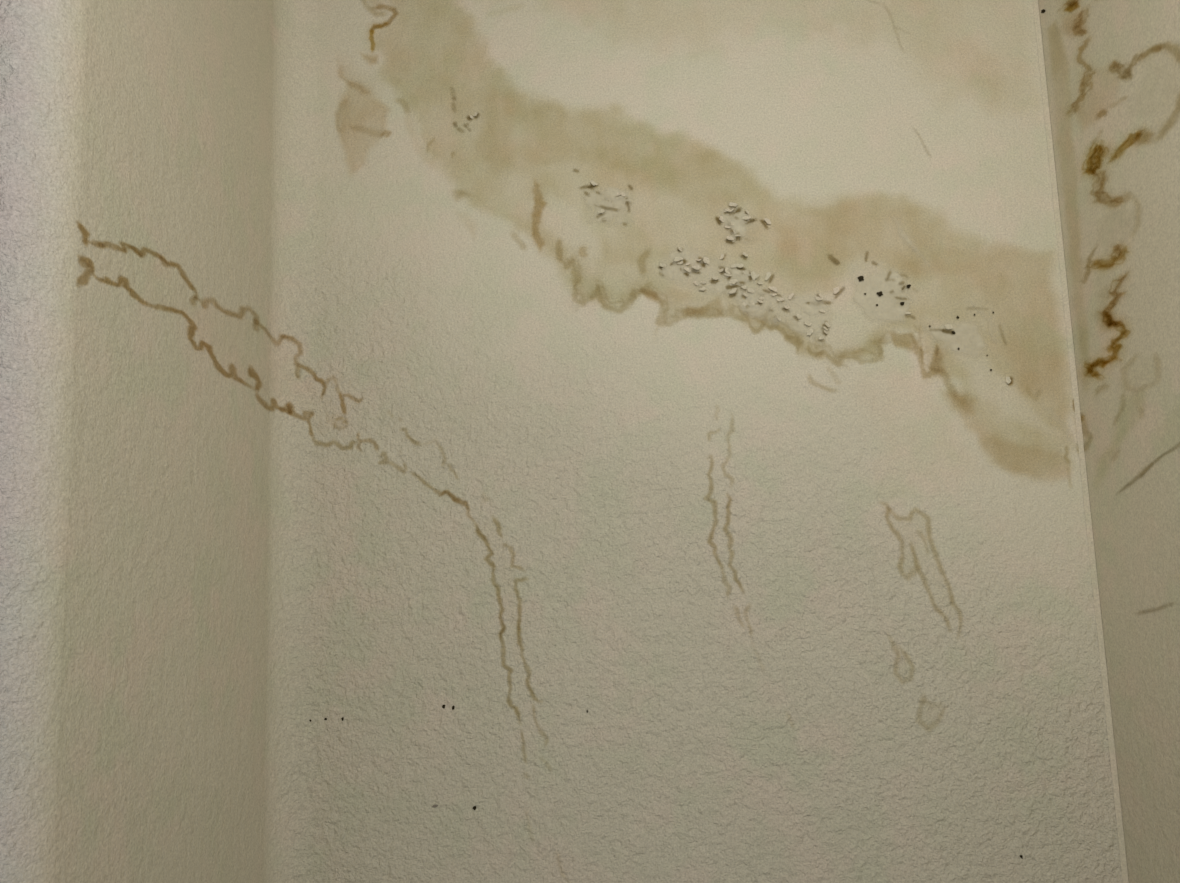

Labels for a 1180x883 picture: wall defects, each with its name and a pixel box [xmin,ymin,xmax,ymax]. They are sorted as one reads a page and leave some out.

peeling [719,202,771,241]
peeling [660,247,839,340]
peeling [855,272,911,320]